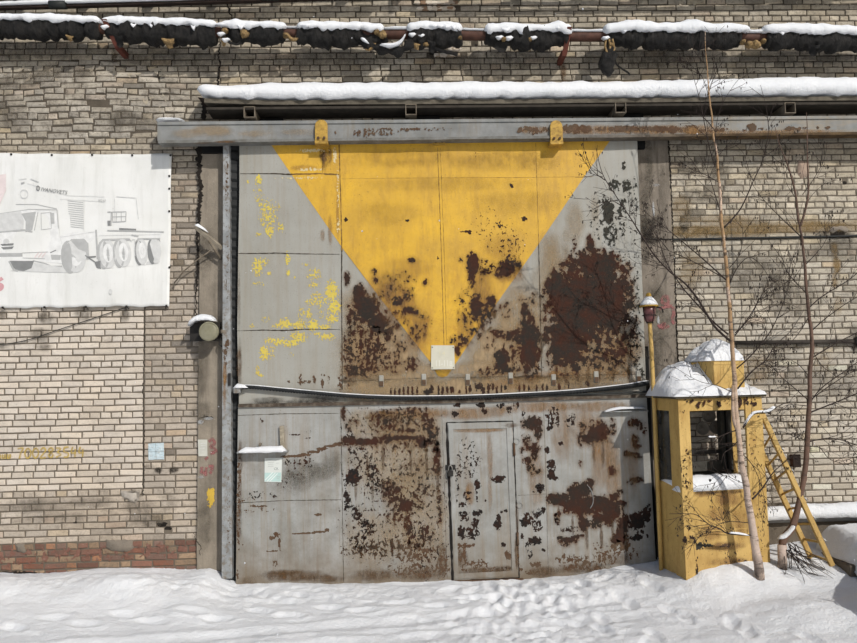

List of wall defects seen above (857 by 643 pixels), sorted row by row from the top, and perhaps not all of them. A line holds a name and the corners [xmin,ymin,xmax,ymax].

peeling [247,174,284,239]
peeling [296,147,339,207]
peeling [249,251,433,392]
corrosion [343,287,636,401]
peeling [336,161,651,582]
corrosion [366,409,438,485]
corrosion [699,490,741,513]
peeling [266,532,281,567]